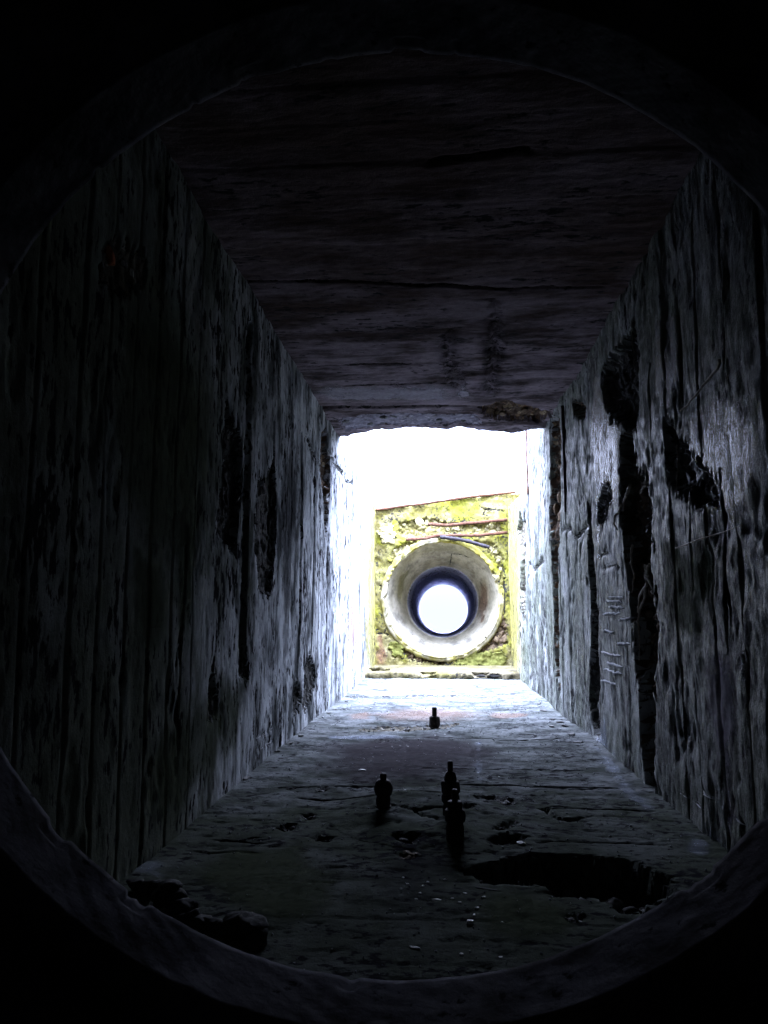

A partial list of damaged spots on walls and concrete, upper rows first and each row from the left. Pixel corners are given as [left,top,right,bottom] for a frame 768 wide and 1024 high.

spalling [663,419,719,511]
water stain [600,596,637,685]
spalling [462,821,675,914]